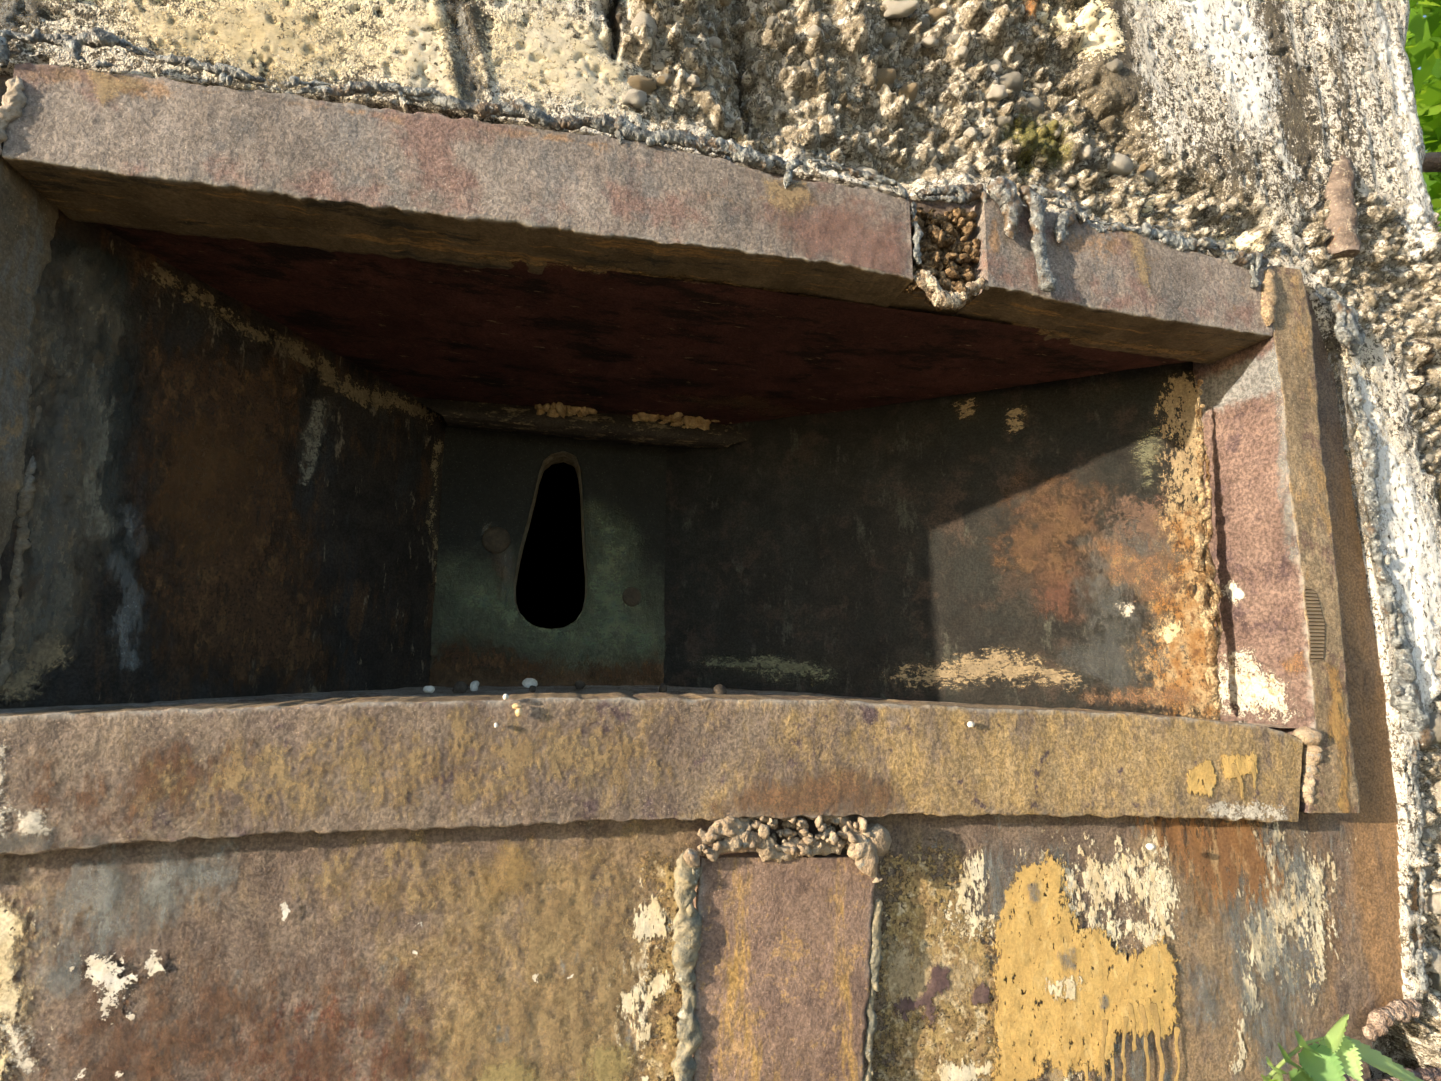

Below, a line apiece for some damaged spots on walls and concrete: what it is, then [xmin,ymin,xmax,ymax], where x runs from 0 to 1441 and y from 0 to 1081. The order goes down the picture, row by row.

crack [608,0,623,62]
crack [733,57,749,134]
corrosion [764,178,990,311]
corrosion [992,473,1220,720]
corrosion [138,706,672,833]
peeling [69,949,165,1024]
corrosion [624,851,682,1081]
peeling [869,838,1016,1081]
peeling [1045,950,1083,1002]
peeling [1013,825,1185,969]
corrosion [1136,816,1284,917]
peeling [1042,1047,1083,1081]